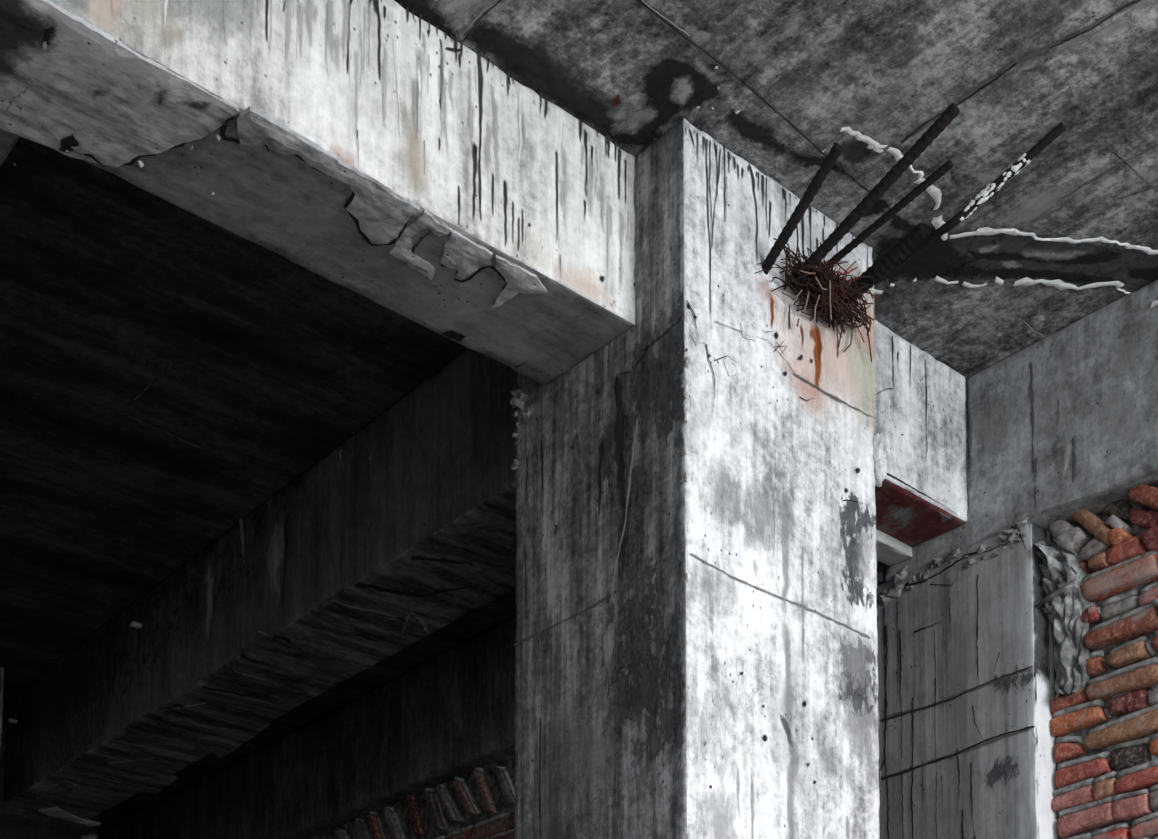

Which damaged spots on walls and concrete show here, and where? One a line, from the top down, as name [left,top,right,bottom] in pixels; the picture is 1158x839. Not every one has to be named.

water stain [0,0,55,83]
flaking render [0,0,547,309]
water stain [164,0,791,313]
spalling [762,142,843,275]
spalling [789,103,960,291]
water stain [724,109,1158,294]
spalling [848,122,1066,298]
rust [788,305,868,399]
water stain [840,492,876,609]
water stain [838,636,878,745]
crack [879,575,1000,839]